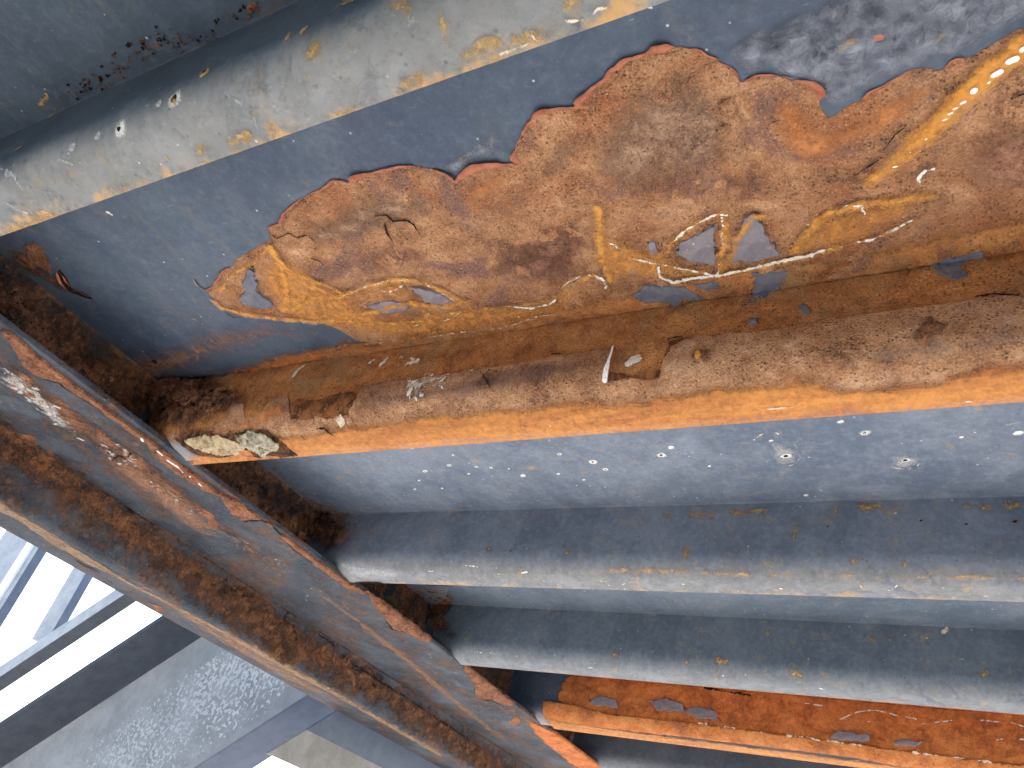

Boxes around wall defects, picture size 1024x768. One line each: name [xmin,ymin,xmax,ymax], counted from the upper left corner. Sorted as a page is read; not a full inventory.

corrosion [66,2,260,100]
corrosion [564,0,581,23]
corrosion [131,28,1024,442]
corrosion [0,286,133,403]
corrosion [8,368,262,559]
corrosion [191,366,1024,545]
corrosion [0,422,517,768]
corrosion [529,675,1024,768]